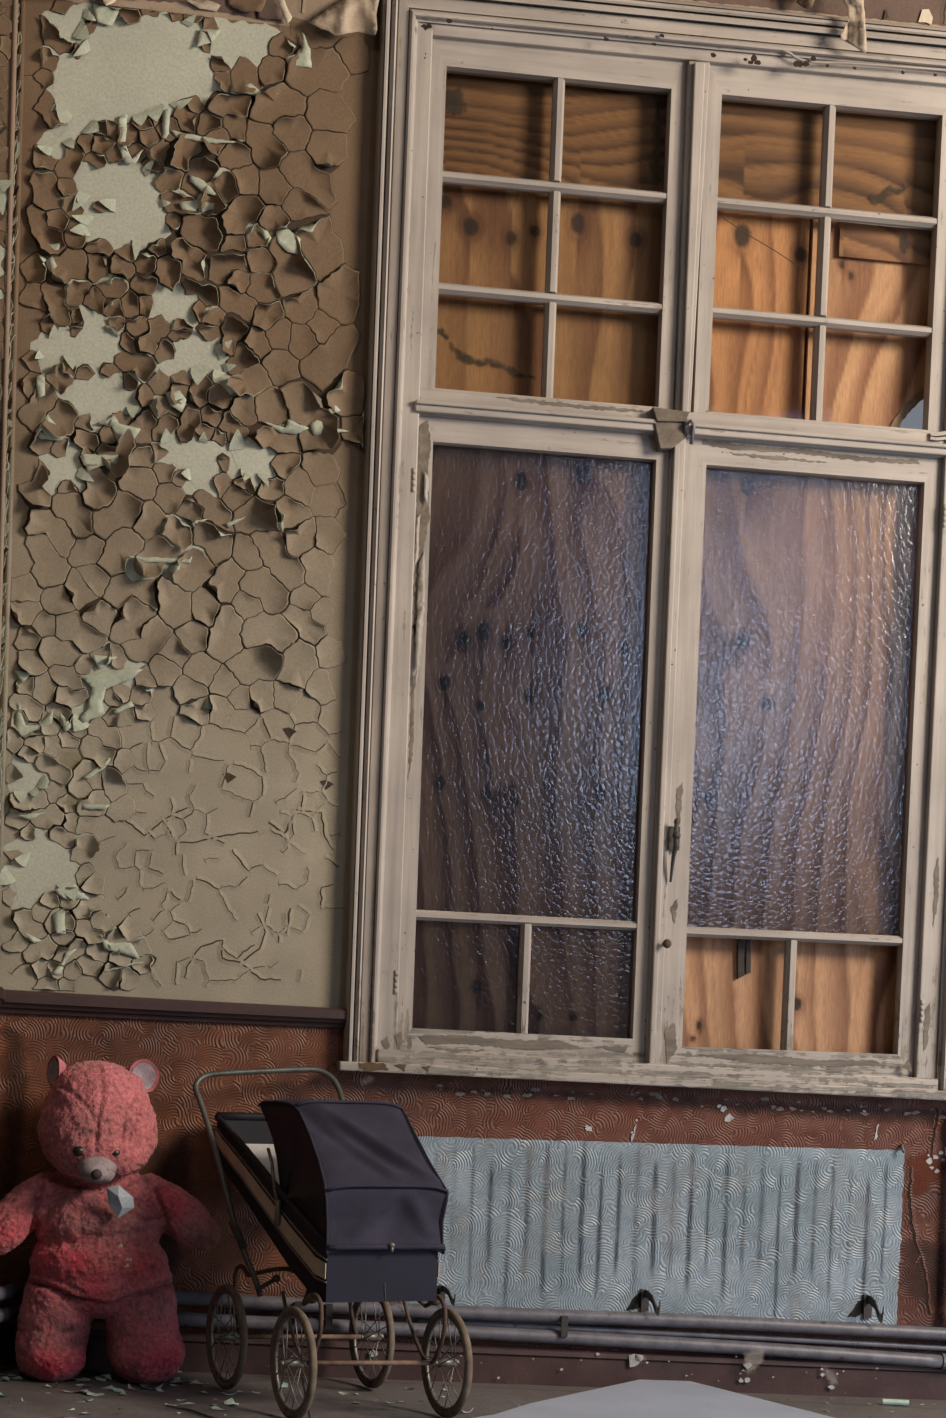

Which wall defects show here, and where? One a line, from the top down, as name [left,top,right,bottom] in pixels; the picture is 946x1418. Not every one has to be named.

peeling [694,0,946,26]
peeling [0,0,381,991]
crack [85,700,345,988]